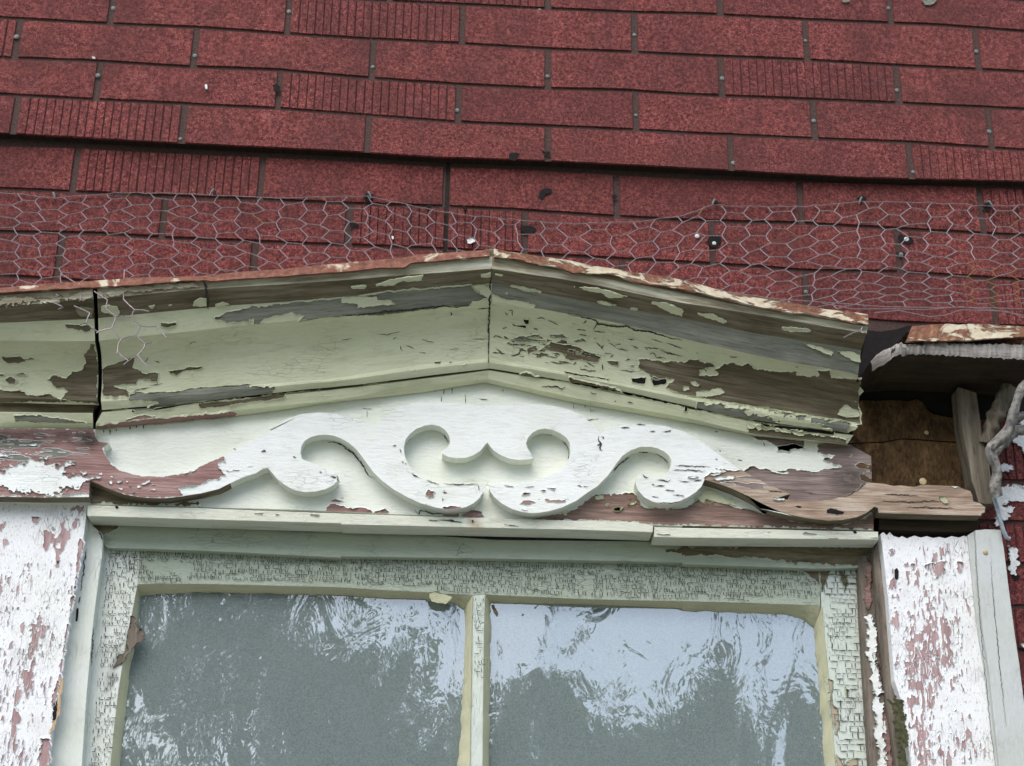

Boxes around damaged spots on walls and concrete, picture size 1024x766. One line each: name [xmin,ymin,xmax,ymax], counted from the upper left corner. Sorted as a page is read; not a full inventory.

crack [78,532,891,766]
peeling [0,272,986,766]